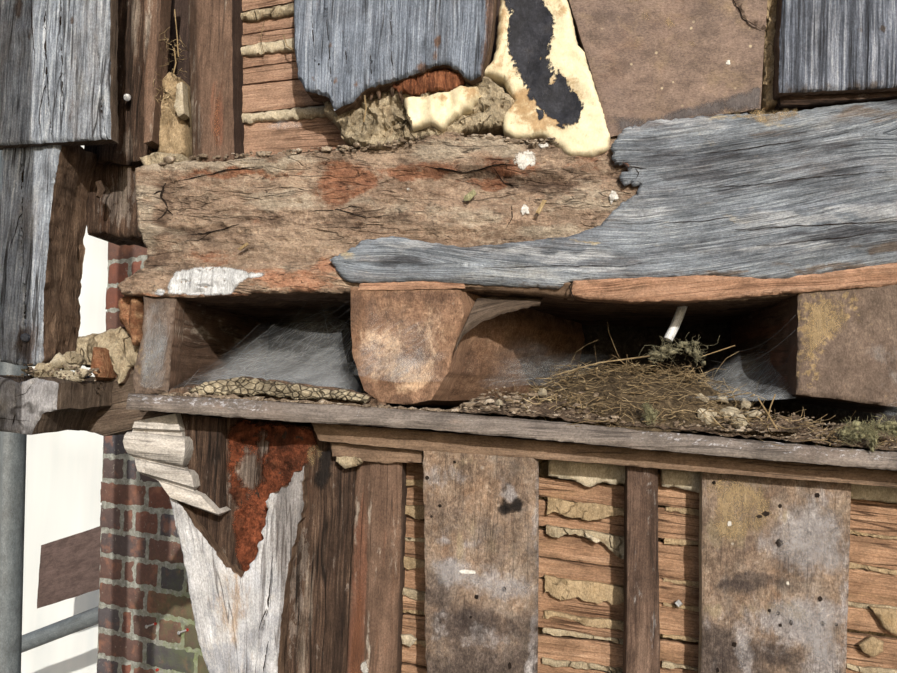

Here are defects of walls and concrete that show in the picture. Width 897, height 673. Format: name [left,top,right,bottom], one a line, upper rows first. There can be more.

crack [154,167,254,220]
leakage [717,481,768,536]